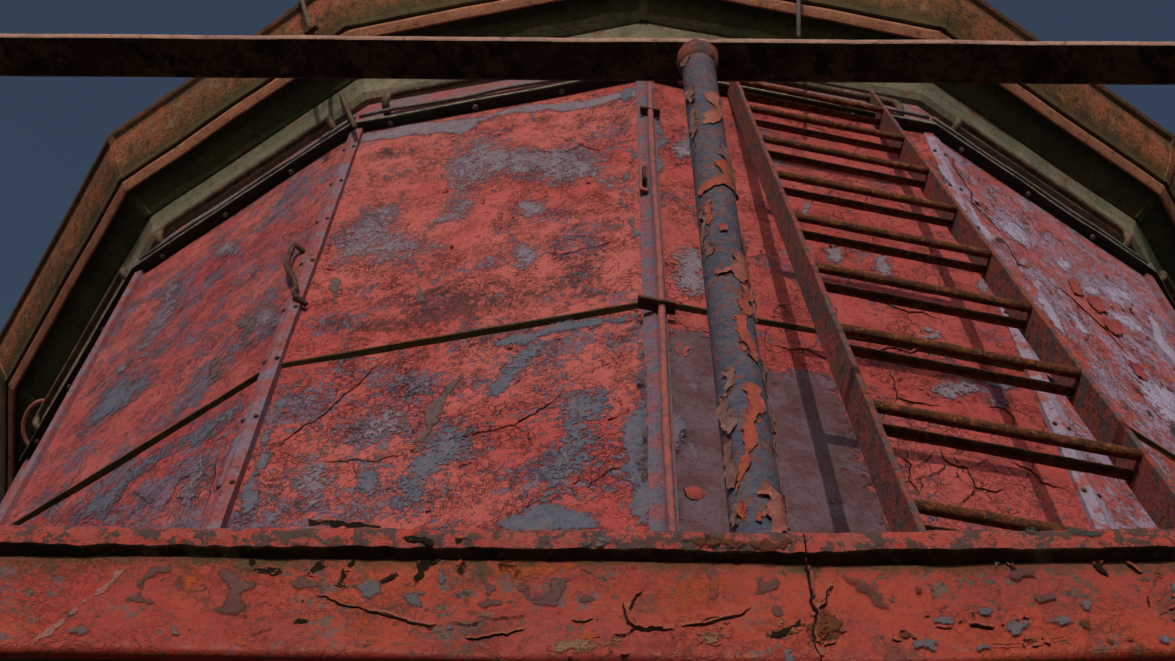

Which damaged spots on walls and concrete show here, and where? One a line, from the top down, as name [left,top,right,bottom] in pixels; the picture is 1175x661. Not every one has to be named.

rust [858,68,914,82]
peeling [323,87,691,271]
peeling [936,148,1038,252]
crack [270,359,385,450]
peeling [290,403,476,535]
peeling [481,309,649,546]
peeling [666,142,890,534]
crack [899,399,1065,503]
peeling [1052,254,1175,370]
peeling [1119,354,1175,426]
crack [571,591,751,636]
crack [805,561,834,655]